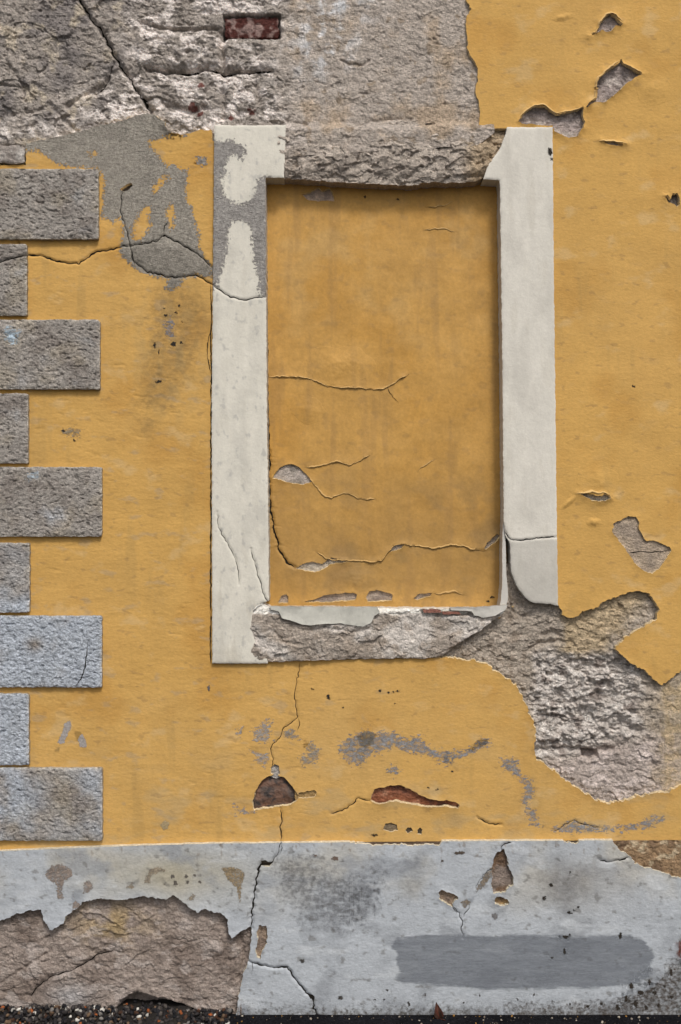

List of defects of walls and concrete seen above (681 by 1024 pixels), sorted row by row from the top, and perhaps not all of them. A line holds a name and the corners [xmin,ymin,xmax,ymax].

flaking render [0,0,494,301]
flaking render [519,61,641,138]
crack [0,193,268,663]
crack [268,350,409,568]
peeling [270,590,392,627]
crack [317,544,481,562]
flaking render [233,718,321,817]
crack [270,663,300,769]
flaking render [414,562,681,802]
crack [251,808,283,928]
flaking render [0,864,268,1014]
crack [251,962,317,1014]